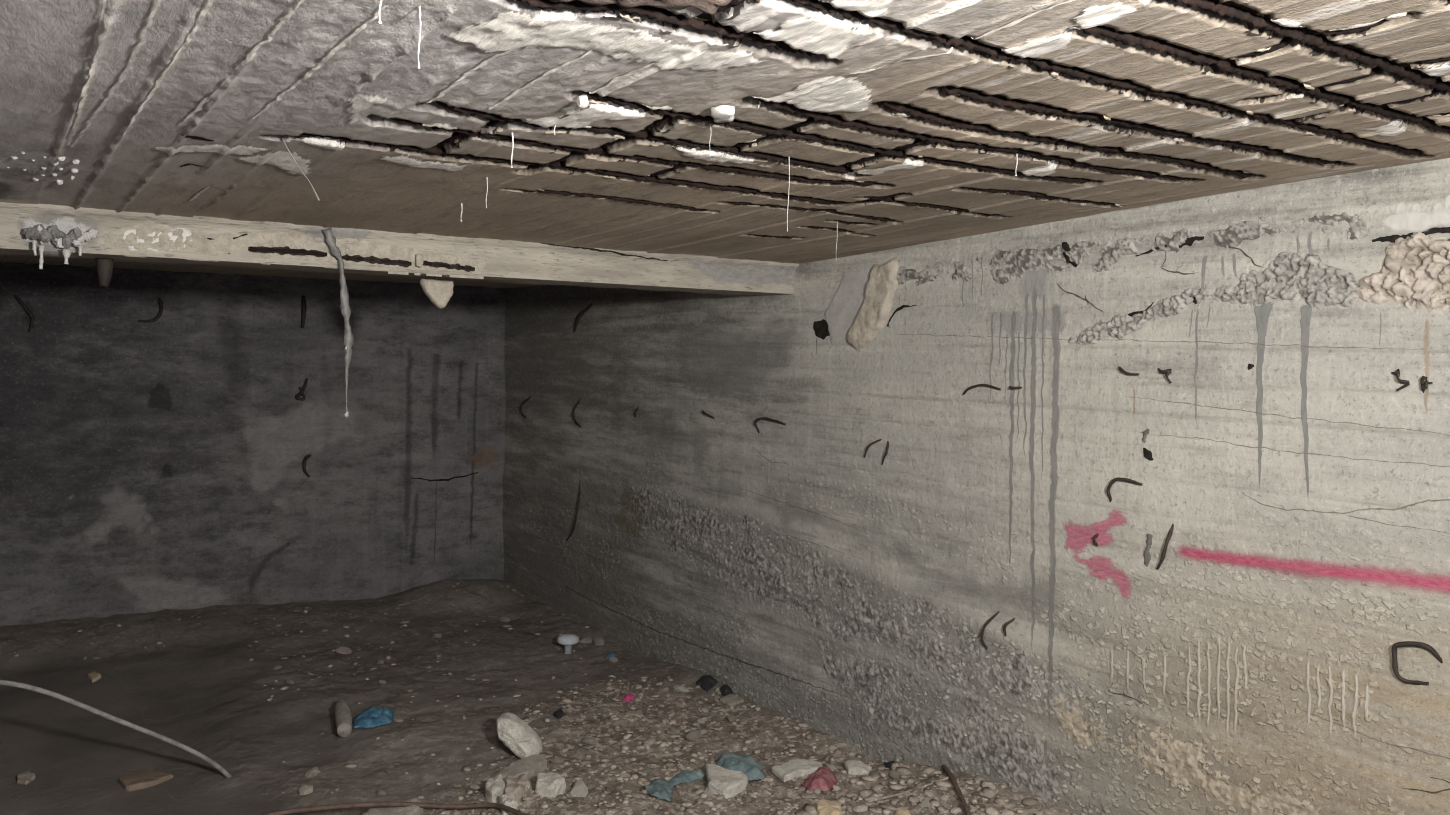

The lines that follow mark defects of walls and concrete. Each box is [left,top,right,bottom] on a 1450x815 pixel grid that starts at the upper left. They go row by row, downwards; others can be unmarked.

spalling [518,0,818,57]
spalling [791,0,1450,155]
damp [22,216,97,269]
damp [310,227,365,250]
spalling [295,86,1341,239]
spalling [813,212,1450,350]
damp [1254,302,1272,484]
damp [1300,305,1312,492]
damp [989,265,1063,705]
crack [1302,710,1450,794]